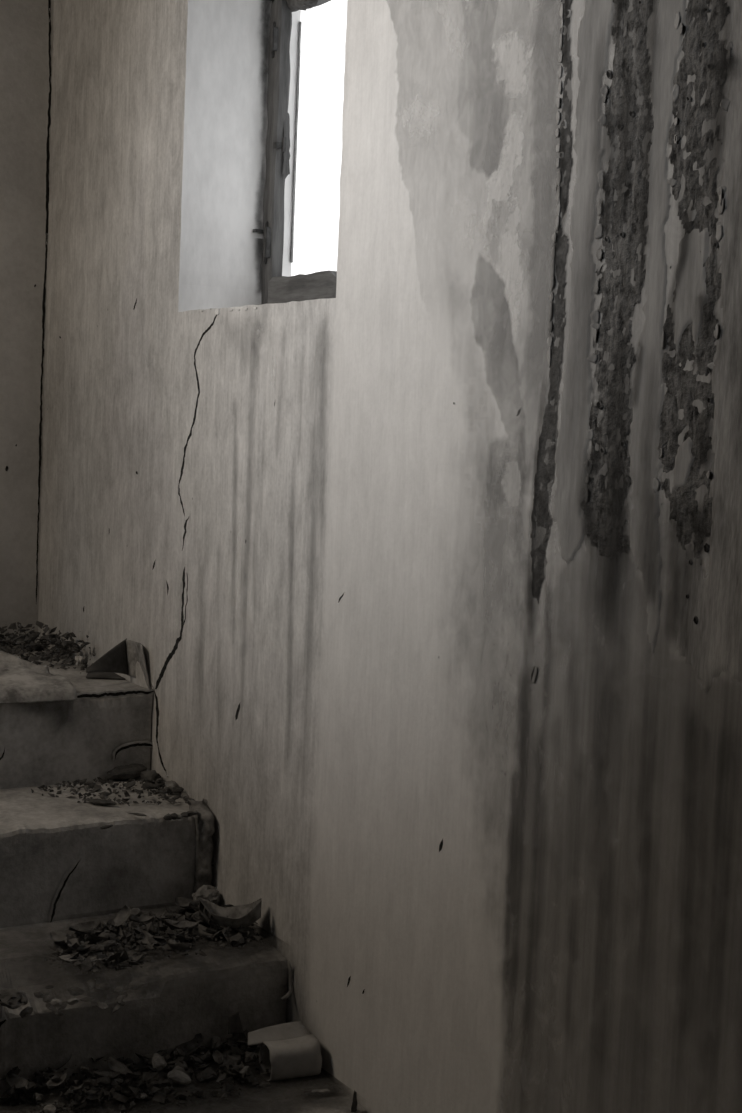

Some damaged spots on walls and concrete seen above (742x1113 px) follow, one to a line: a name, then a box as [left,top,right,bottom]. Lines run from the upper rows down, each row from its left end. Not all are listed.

crack [77,314,218,777]
peeling [528,0,742,694]
crack [48,858,82,922]